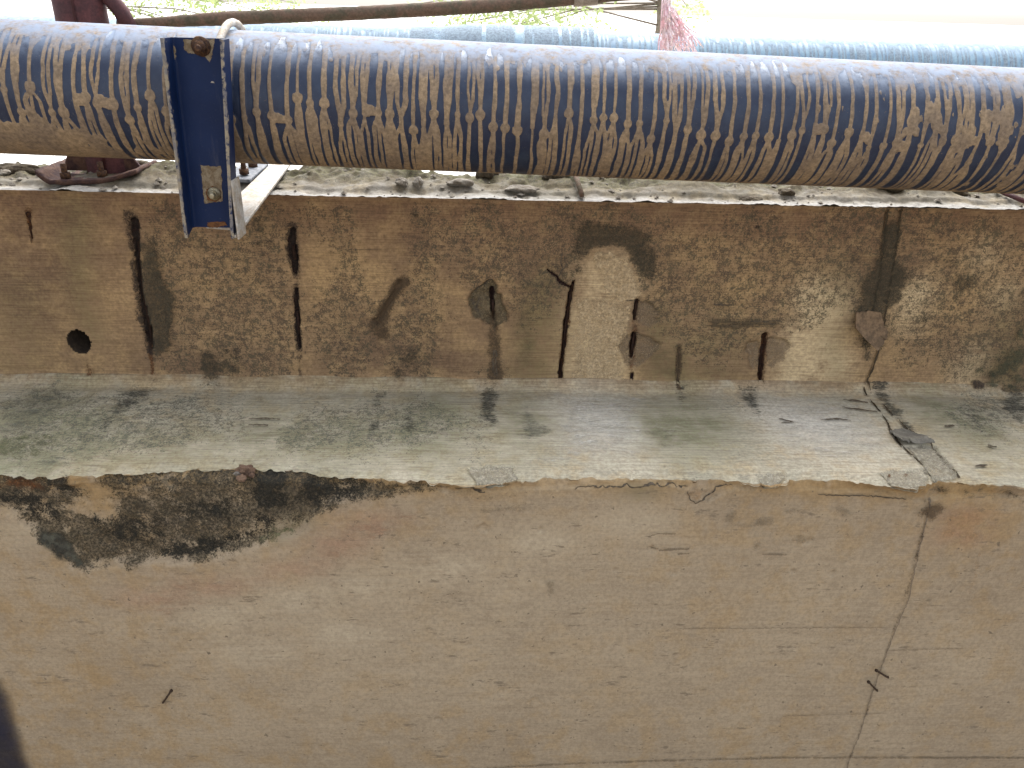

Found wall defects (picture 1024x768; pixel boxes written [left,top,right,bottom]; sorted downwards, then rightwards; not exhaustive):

crack [546,252,570,287]
damp [571,217,657,280]
damp [140,235,175,362]
peeling [855,310,888,350]
spalling [880,444,955,490]